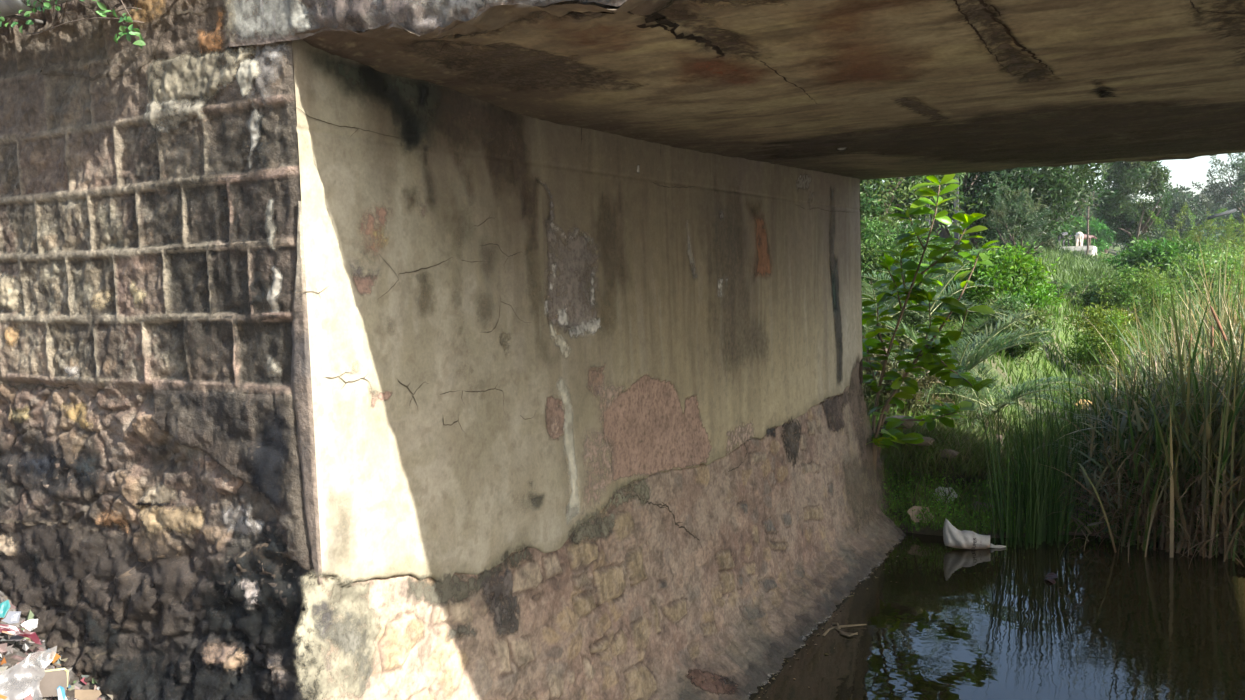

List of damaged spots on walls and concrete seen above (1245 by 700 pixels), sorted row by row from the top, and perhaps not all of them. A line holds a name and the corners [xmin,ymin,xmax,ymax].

crack [600,6,725,58]
crack [953,0,1053,75]
damp [316,55,623,358]
peeling [353,253,377,295]
crack [379,216,523,298]
damp [823,189,894,530]
crack [326,372,533,434]
peeling [545,396,564,439]
damp [557,380,579,520]
peeling [570,375,754,544]
damp [767,417,801,465]